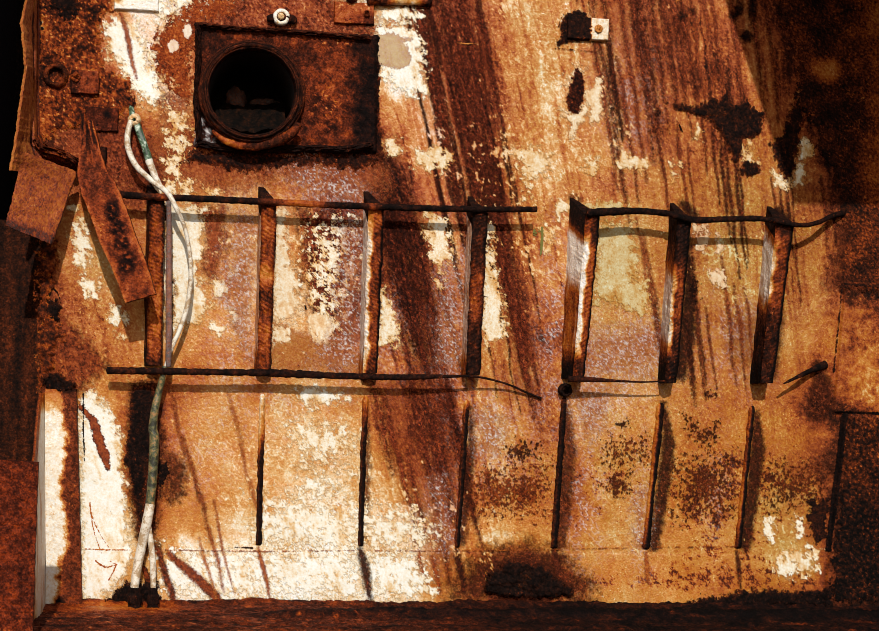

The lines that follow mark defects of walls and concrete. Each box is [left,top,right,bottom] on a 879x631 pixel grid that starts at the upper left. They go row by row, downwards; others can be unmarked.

peeling [374,5,433,100]
peeling [66,199,130,341]
peeling [100,0,242,338]
corrosion [33,0,598,602]
peeling [271,206,363,348]
peeling [378,284,401,350]
corrosion [588,0,753,400]
corrosion [729,0,879,304]
corrosion [808,360,834,420]
peeling [77,388,133,600]
corrosion [644,401,675,584]
corrosion [687,411,879,608]